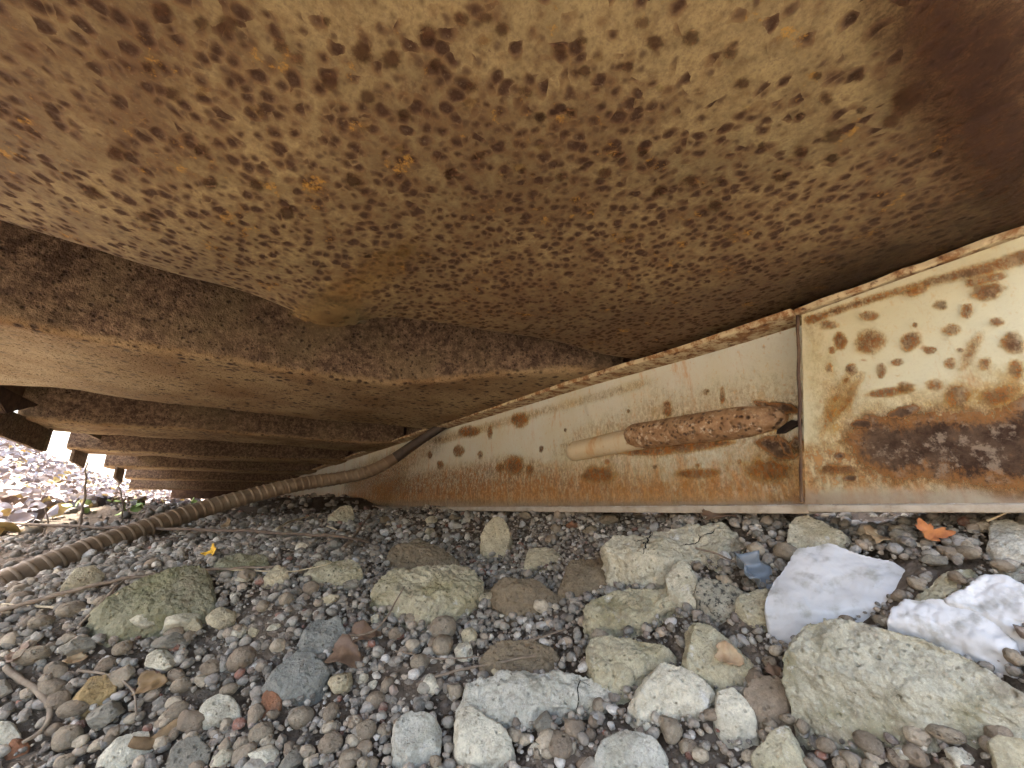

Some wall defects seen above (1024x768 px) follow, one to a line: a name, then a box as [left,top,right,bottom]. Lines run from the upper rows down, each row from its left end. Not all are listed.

corrosion [194,16,236,32]
corrosion [454,12,508,35]
corrosion [636,18,663,49]
corrosion [683,30,699,46]
corrosion [352,42,401,68]
corrosion [868,0,1024,219]
corrosion [826,129,842,163]
corrosion [83,187,99,200]
corrosion [375,250,1024,503]